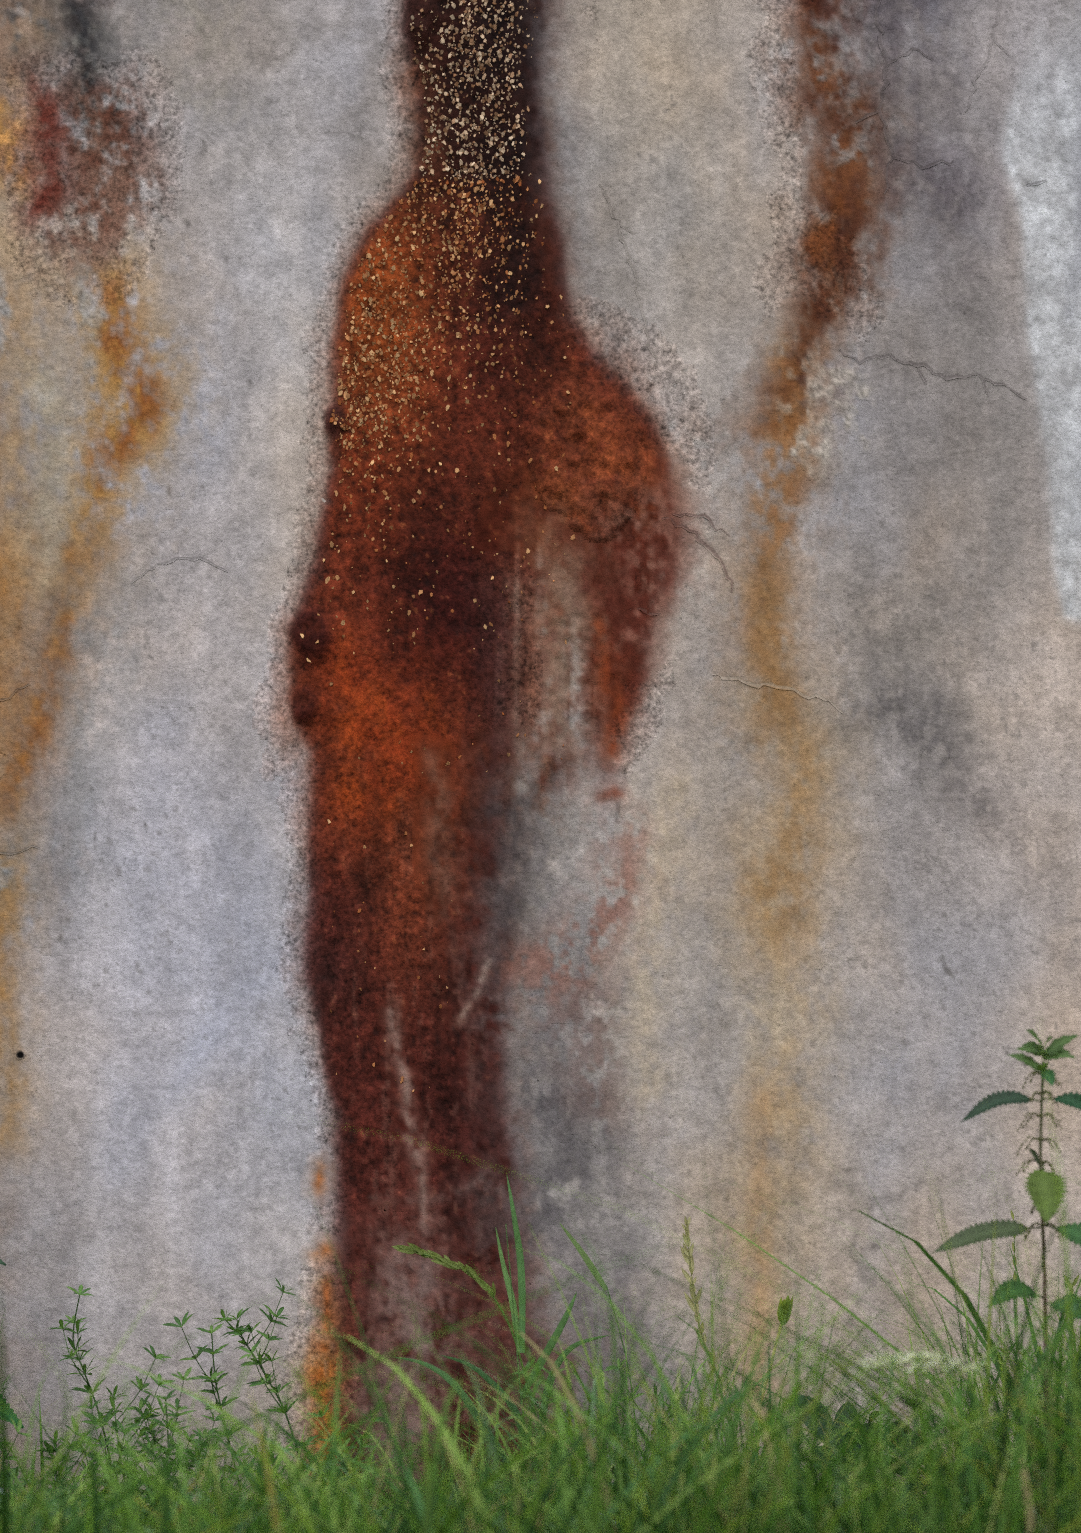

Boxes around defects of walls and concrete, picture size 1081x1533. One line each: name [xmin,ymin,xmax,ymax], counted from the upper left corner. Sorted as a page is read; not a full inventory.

corrosion [0,0,105,148]
corrosion [0,178,231,609]
leakage [787,0,1081,1010]
corrosion [252,0,906,1519]
corrosion [0,915,54,1150]